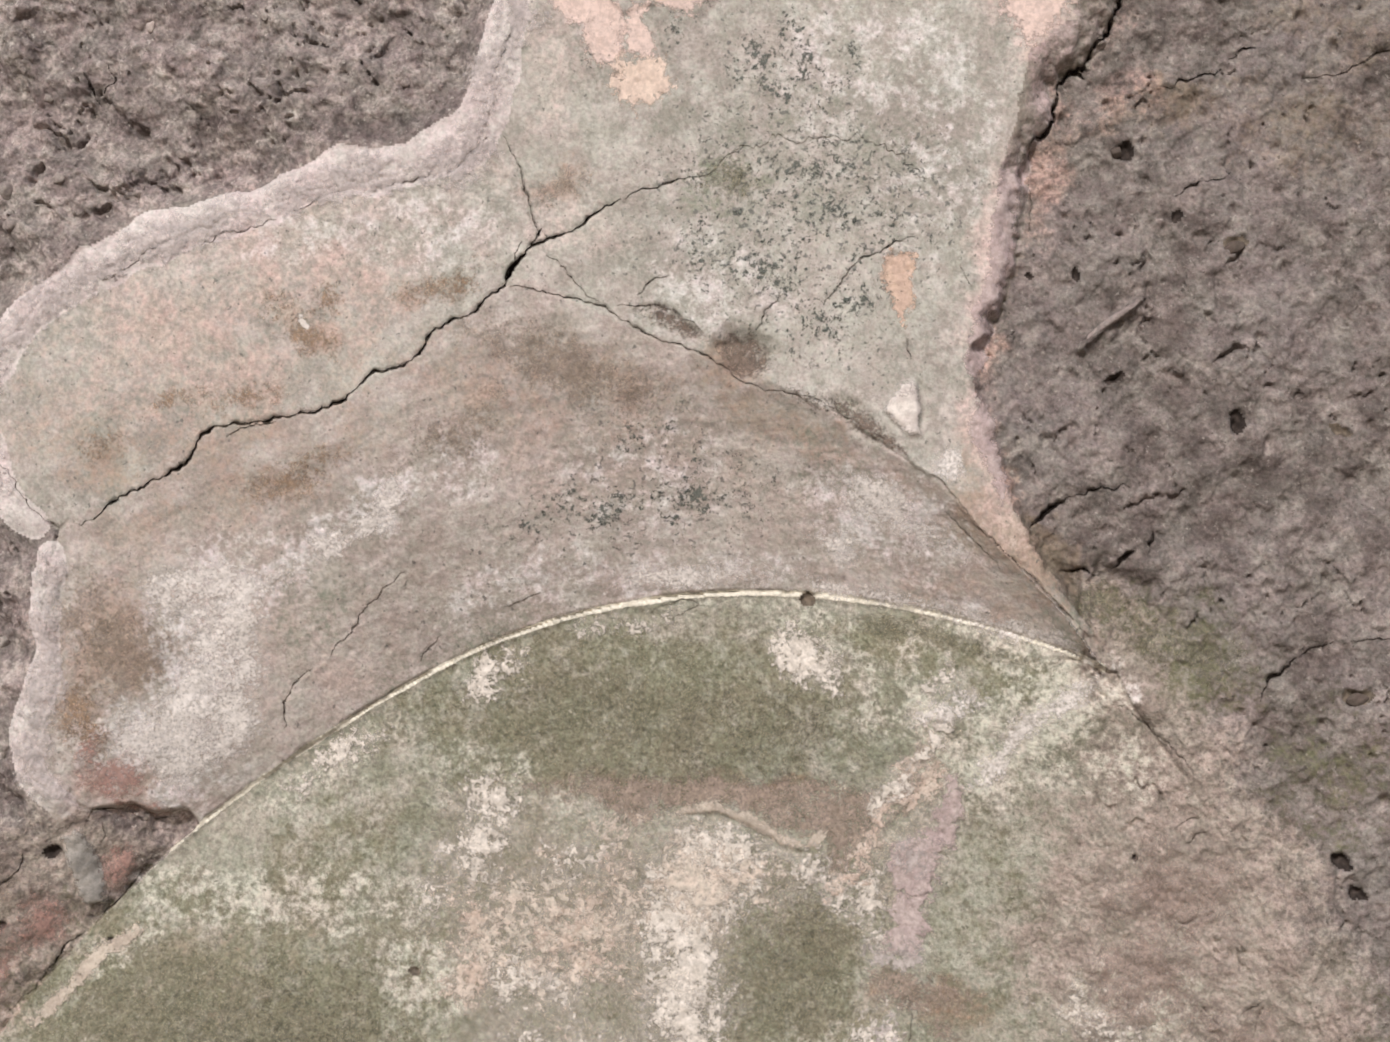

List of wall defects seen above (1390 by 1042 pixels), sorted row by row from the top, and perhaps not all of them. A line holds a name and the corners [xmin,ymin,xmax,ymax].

peeling [547,0,714,119]
crack [1028,0,1122,224]
crack [2,133,1154,632]
damp [11,553,312,799]
crack [282,572,402,728]
damp [307,477,407,561]
damp [616,562,775,589]
damp [811,577,1096,787]